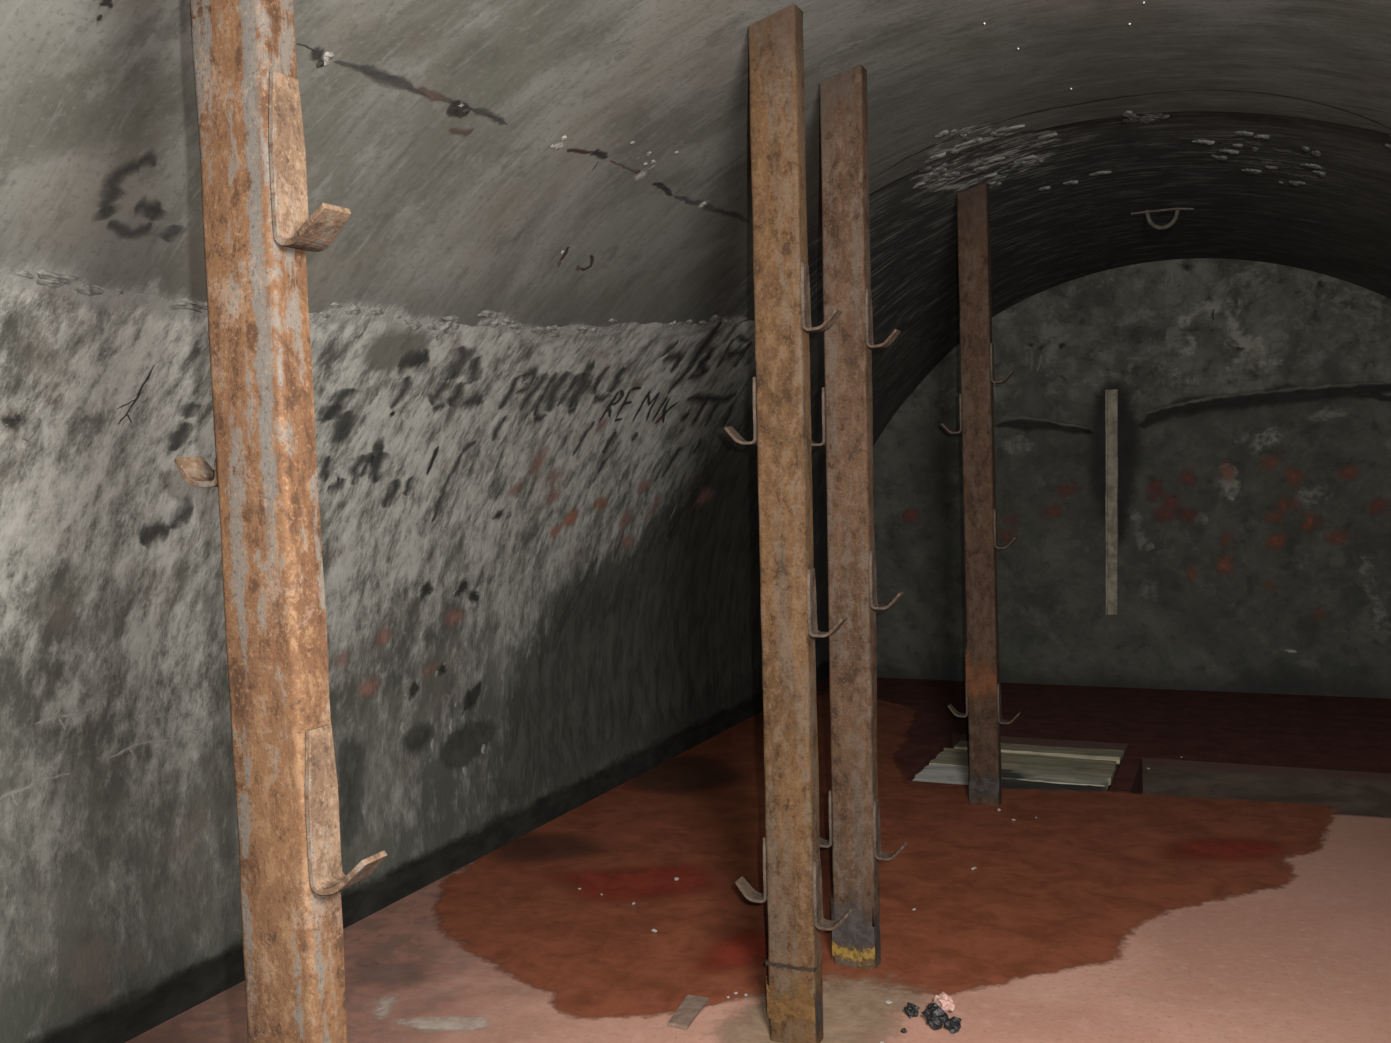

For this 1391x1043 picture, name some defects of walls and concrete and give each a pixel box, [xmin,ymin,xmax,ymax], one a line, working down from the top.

crack [297,43,507,125]
crack [567,149,749,223]
peeling [912,123,1061,192]
peeling [1038,171,1112,191]
crack [1135,382,1391,428]
water stain [486,405,762,823]
rust [965,652,997,701]
water stain [433,711,769,1018]
water stain [816,693,1336,995]
rust [766,976,823,1034]